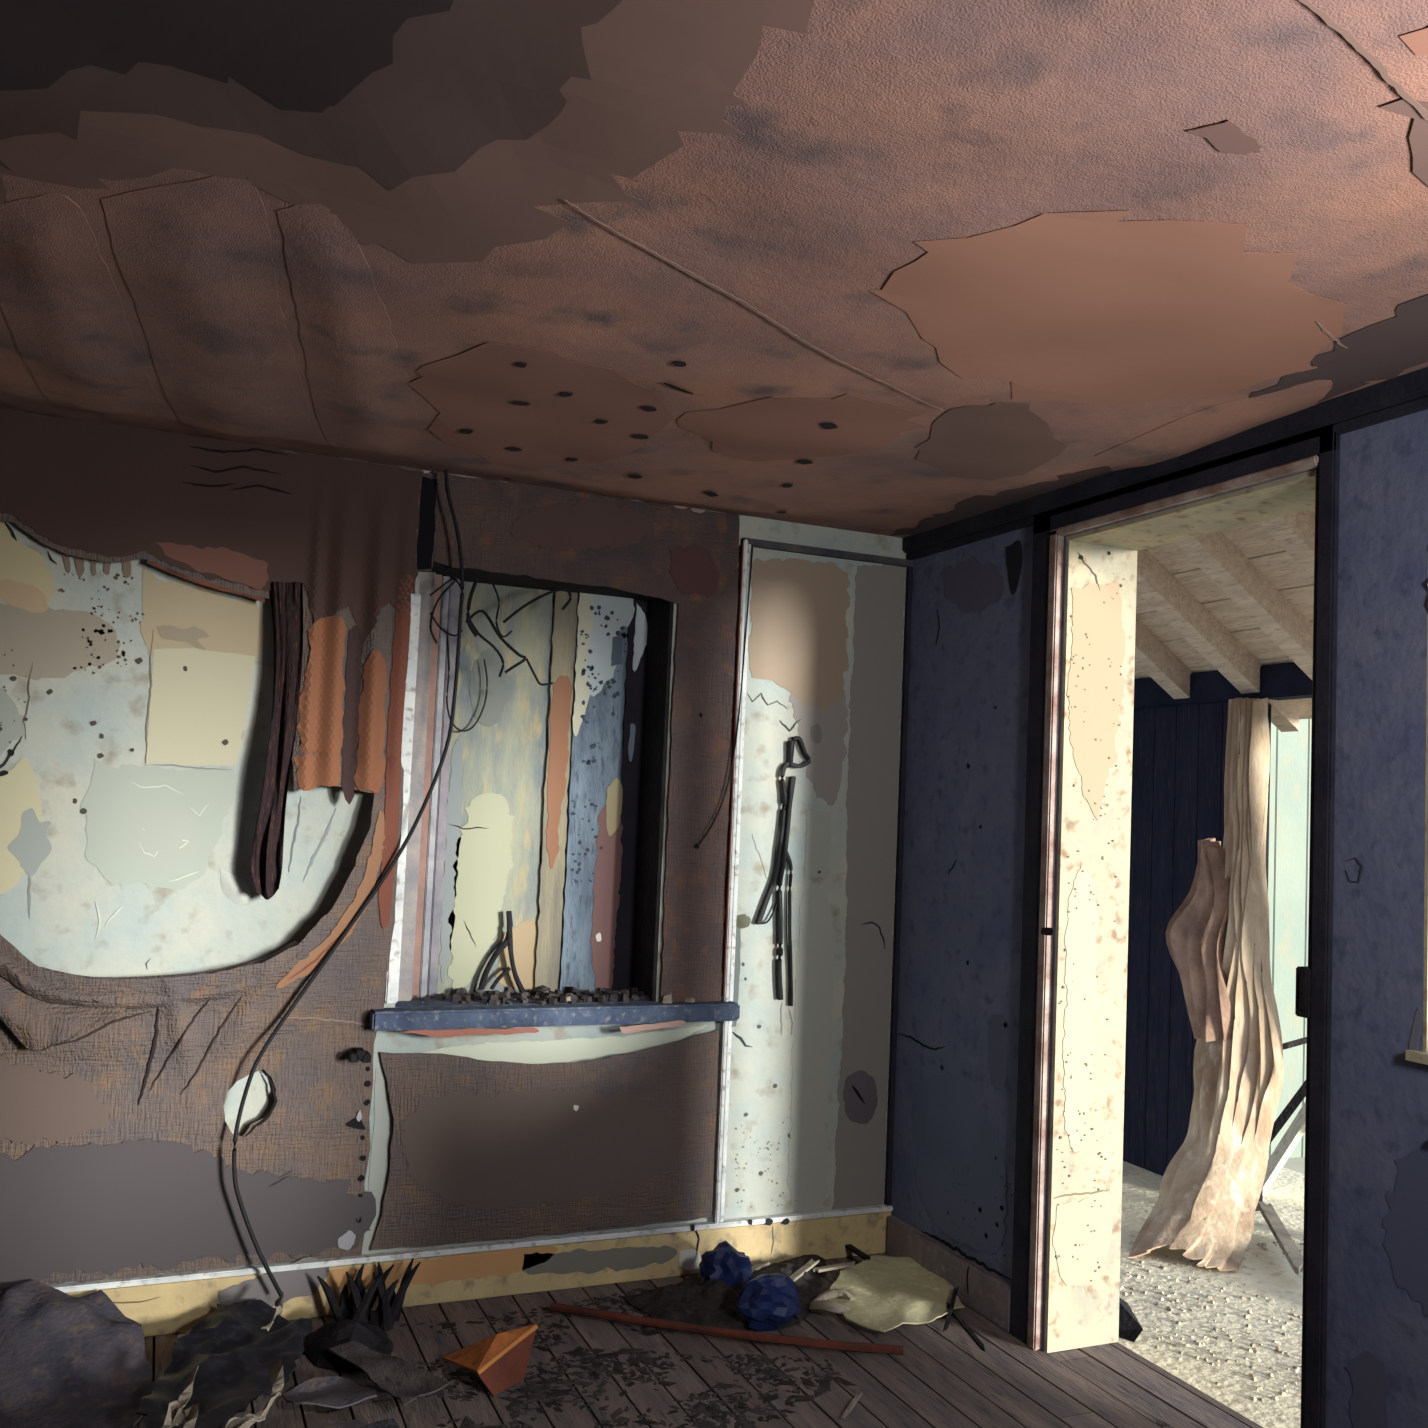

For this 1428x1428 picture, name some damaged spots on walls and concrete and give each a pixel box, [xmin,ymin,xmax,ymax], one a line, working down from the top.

peeling [0,522,55,613]
crack [0,663,33,769]
peeling [572,593,648,736]
peeling [0,749,42,894]
peeling [733,927,747,1003]